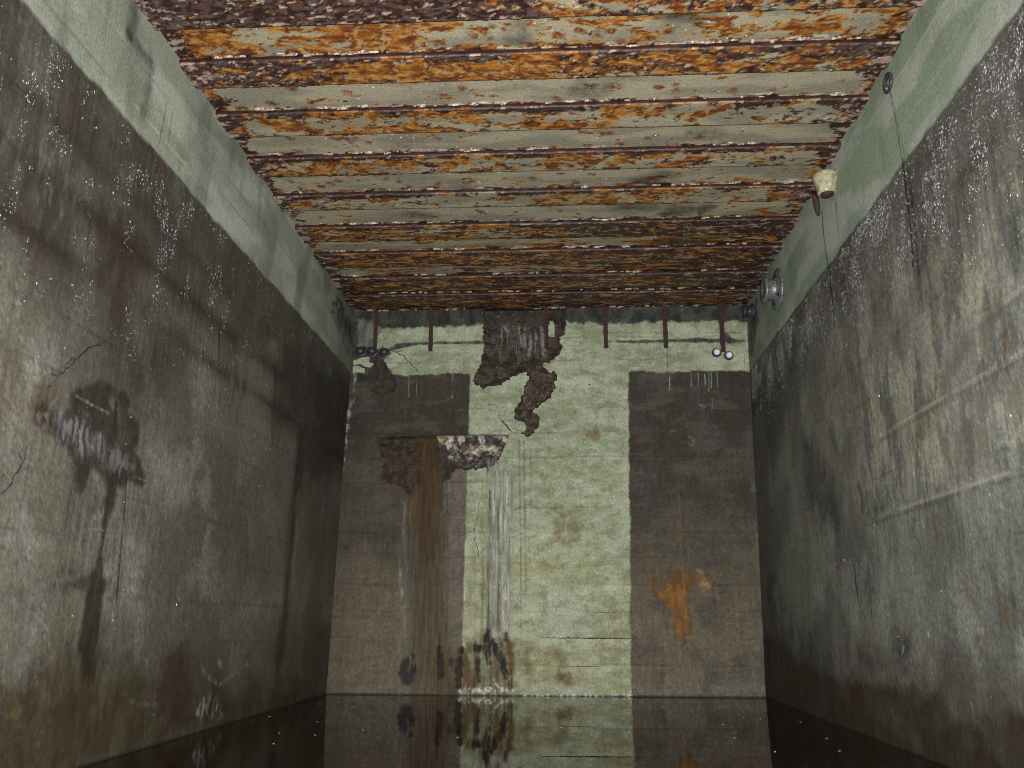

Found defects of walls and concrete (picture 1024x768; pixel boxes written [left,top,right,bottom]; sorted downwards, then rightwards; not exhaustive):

corrosion [432,25,494,51]
corrosion [553,28,624,45]
crack [46,332,112,390]
peeling [350,309,417,395]
spalling [377,307,566,502]
leakage [5,383,230,768]
leakage [437,460,632,697]
corrosion [648,558,712,641]
leakage [398,645,416,684]